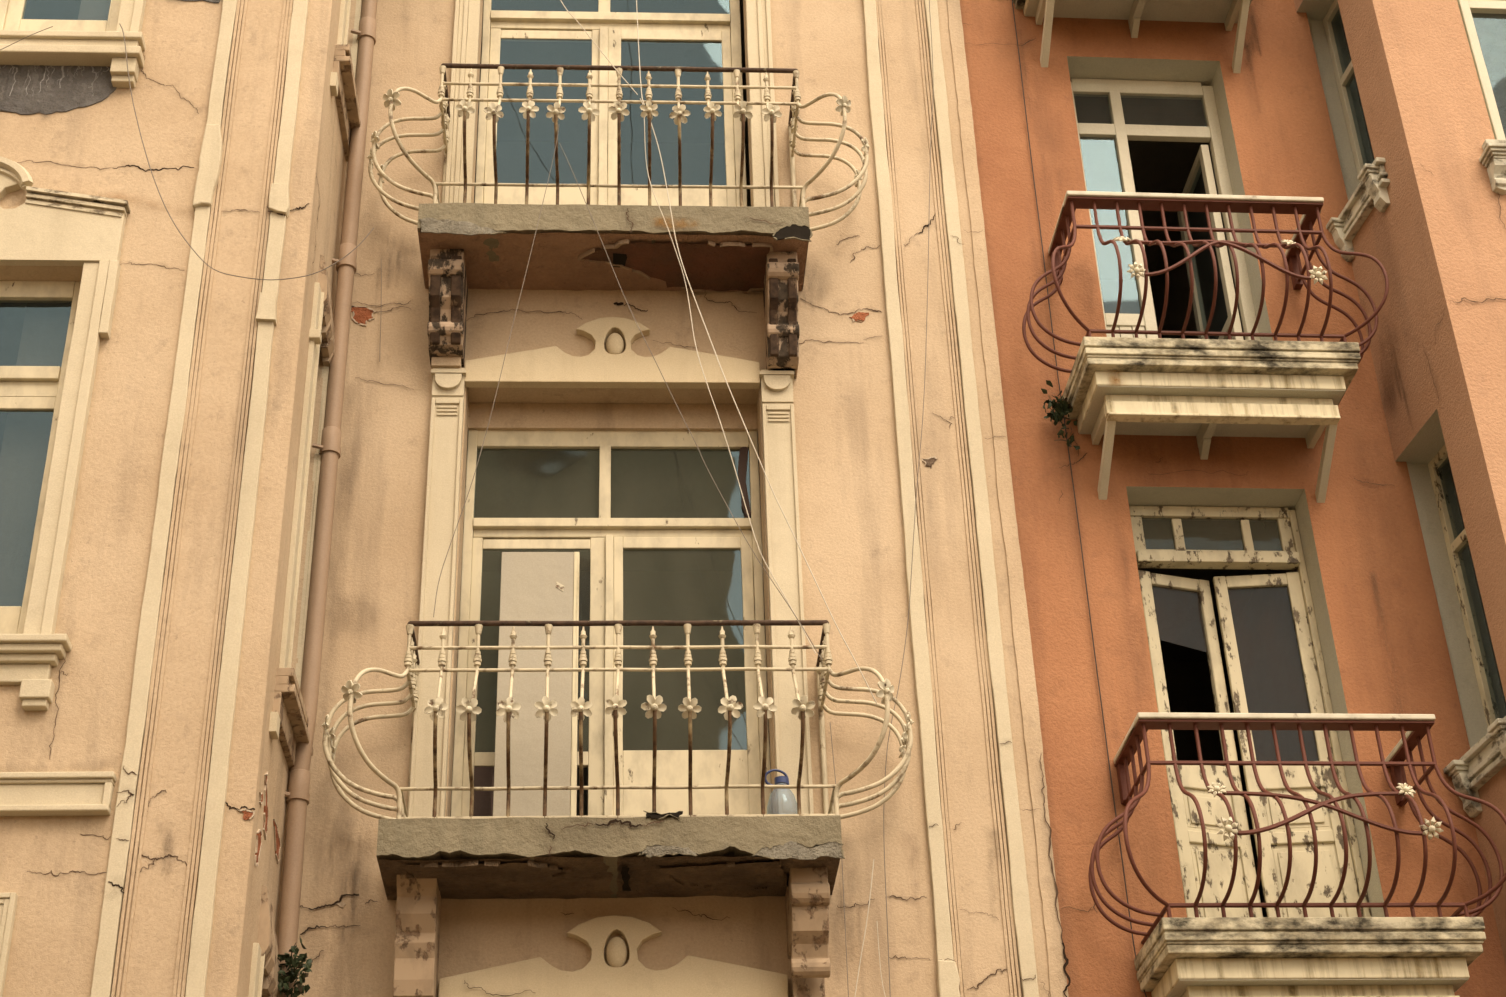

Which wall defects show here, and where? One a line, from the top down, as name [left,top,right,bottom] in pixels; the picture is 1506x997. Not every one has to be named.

crack [16,160,194,172]
flaking render [578,223,813,294]
crack [1423,298,1506,404]
crack [27,767,187,893]
crack [300,893,378,962]